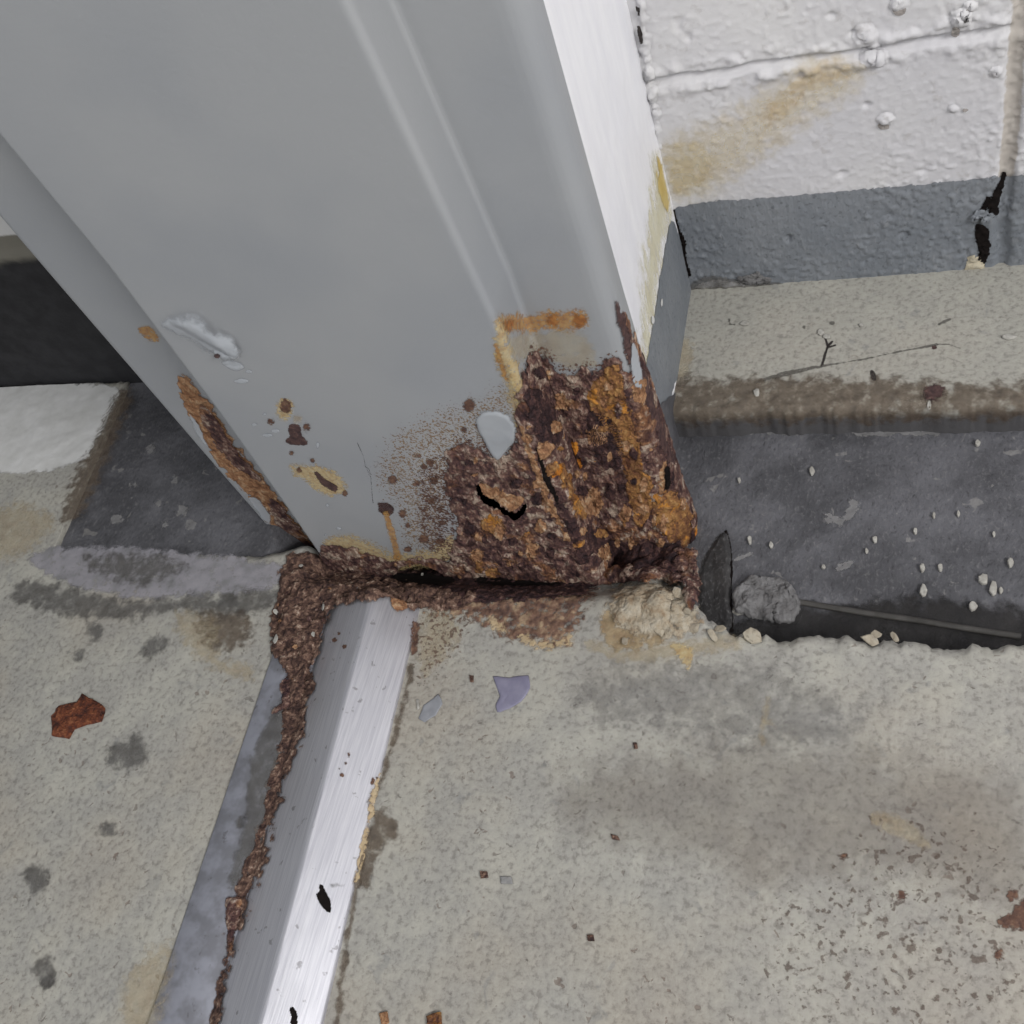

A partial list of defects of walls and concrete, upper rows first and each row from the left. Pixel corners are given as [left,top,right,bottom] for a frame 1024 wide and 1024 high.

crack [975,172,1007,266]
rust [177,302,702,686]
spalling [605,530,762,645]
spalling [861,630,899,646]
rust [379,1011,389,1024]